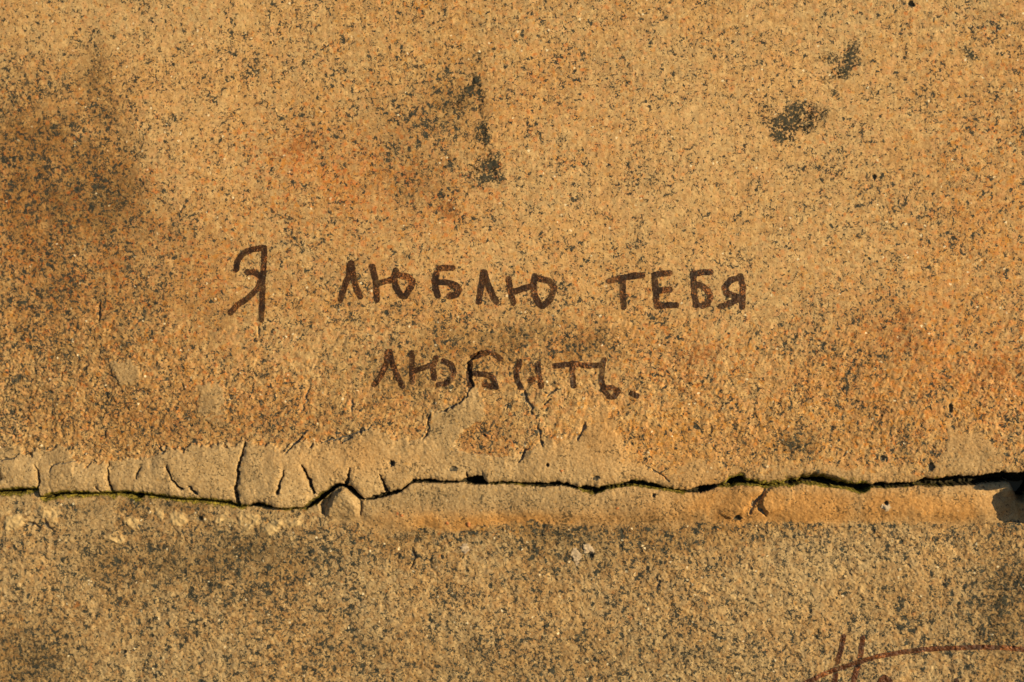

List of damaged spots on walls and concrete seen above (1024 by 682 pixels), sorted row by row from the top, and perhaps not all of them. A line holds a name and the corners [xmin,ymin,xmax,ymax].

crack [0,389,1024,516]